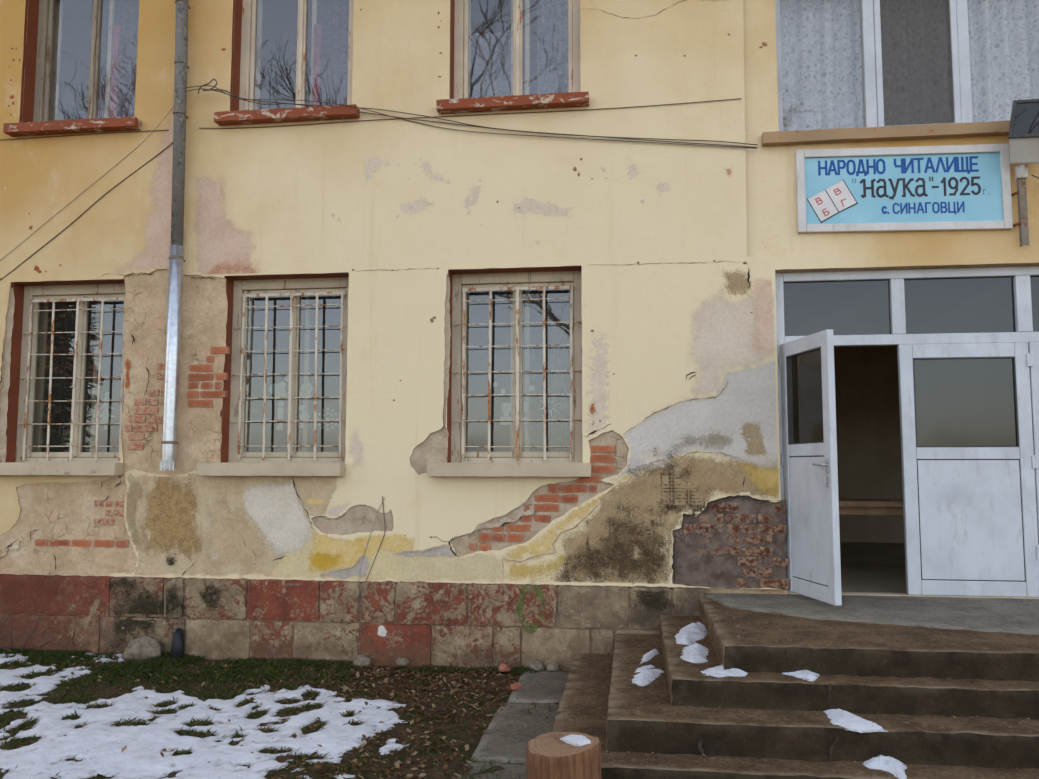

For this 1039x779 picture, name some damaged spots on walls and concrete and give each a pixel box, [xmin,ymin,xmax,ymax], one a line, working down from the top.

spalling [0,95,261,649]
spalling [410,268,451,475]
spalling [270,330,668,582]
water stain [542,421,778,626]
spalling [657,453,789,590]